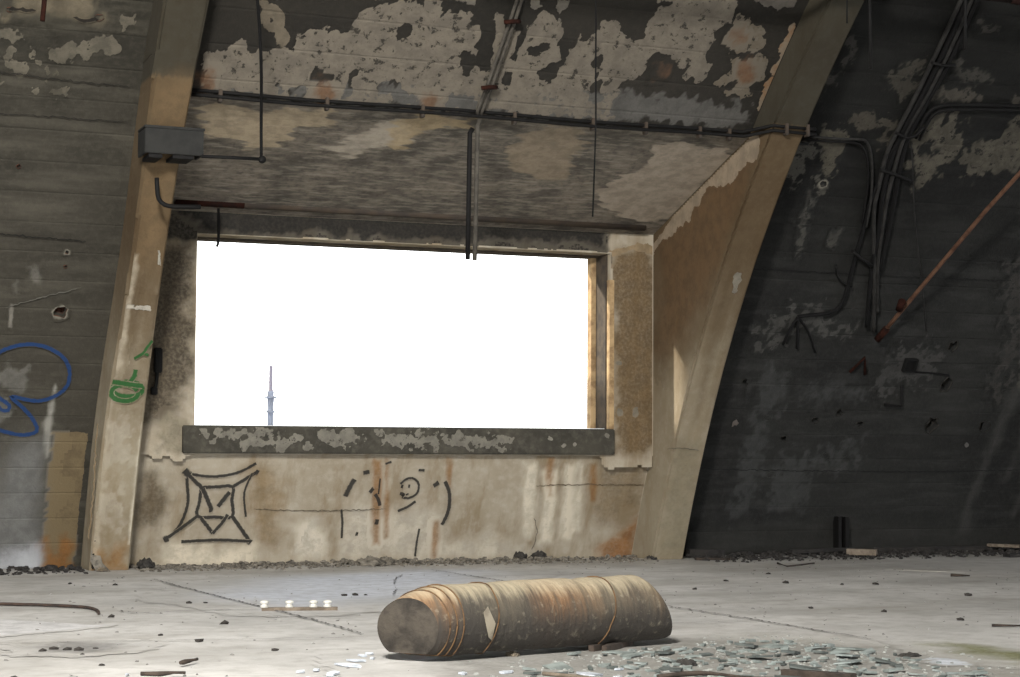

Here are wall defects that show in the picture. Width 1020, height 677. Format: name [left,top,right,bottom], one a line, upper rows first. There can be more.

peeling [0,0,138,101]
peeling [188,0,798,257]
peeling [780,53,938,261]
peeling [896,50,1020,241]
peeling [90,249,525,572]
corrosion [29,524,81,568]
peeling [55,430,90,535]
corrosion [91,537,130,571]
corrosion [366,456,395,550]
corrosion [426,516,444,561]
corrosion [442,456,457,492]
corrosion [583,505,640,558]